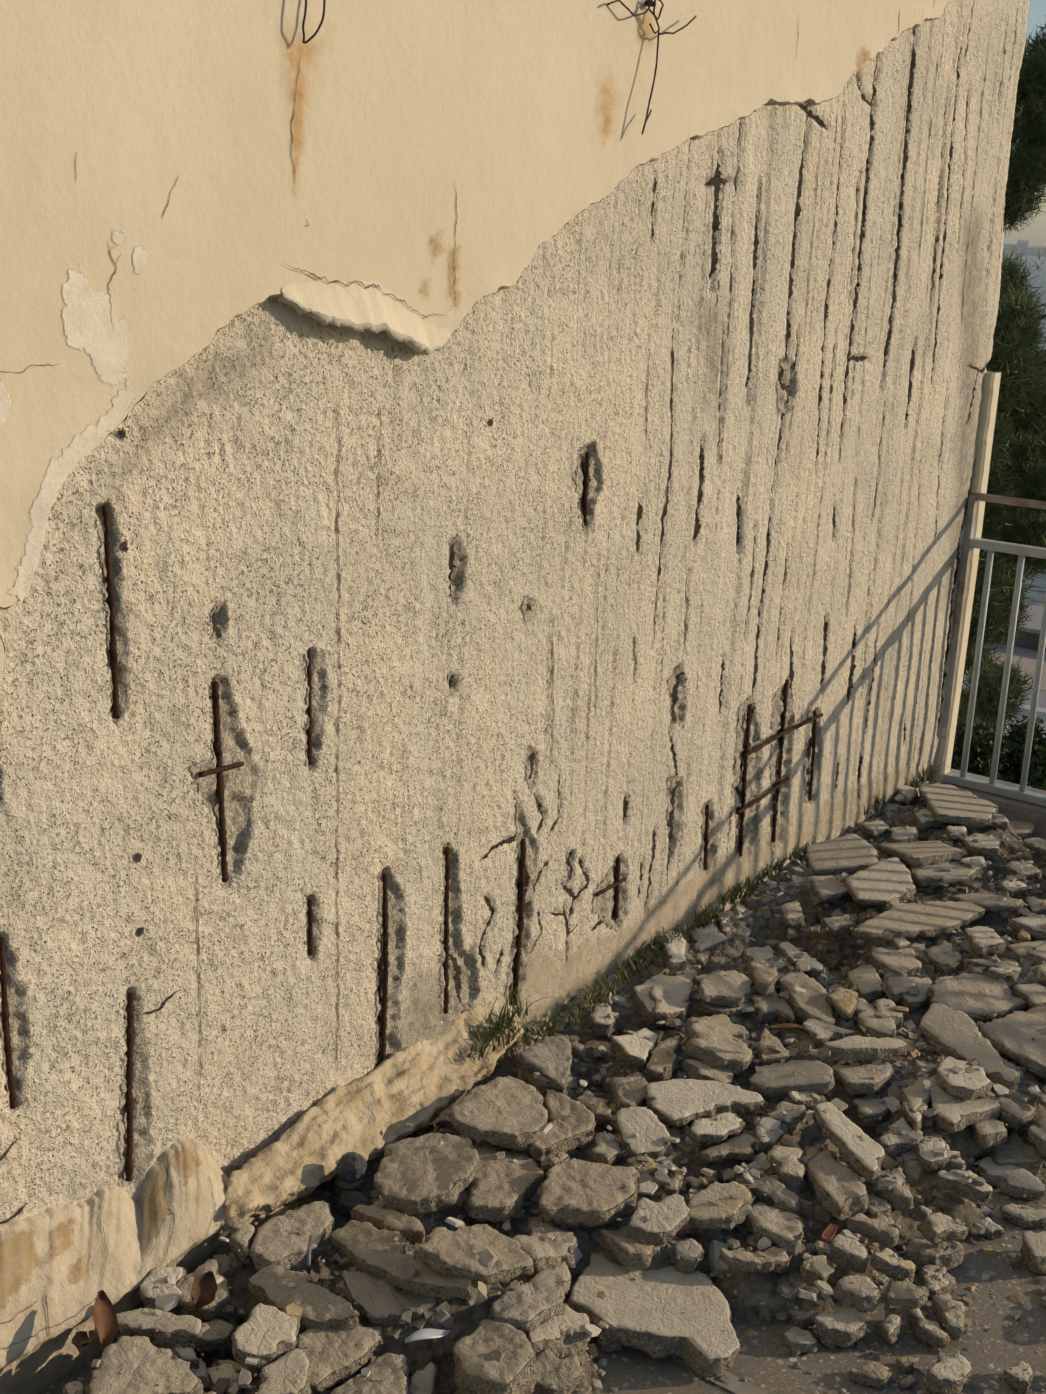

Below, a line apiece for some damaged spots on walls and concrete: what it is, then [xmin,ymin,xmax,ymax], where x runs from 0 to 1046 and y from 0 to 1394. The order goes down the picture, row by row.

spalling [574,441,605,534]
crack [634,0,1007,803]
spalling [102,506,120,719]
crack [594,548,602,724]
spalling [198,681,244,883]
crack [335,398,343,1081]
spalling [380,874,389,1063]
spalling [504,796,541,1012]
crack [450,616,605,983]
crack [623,730,678,912]
spalling [744,713,823,806]
spalling [125,992,135,1182]